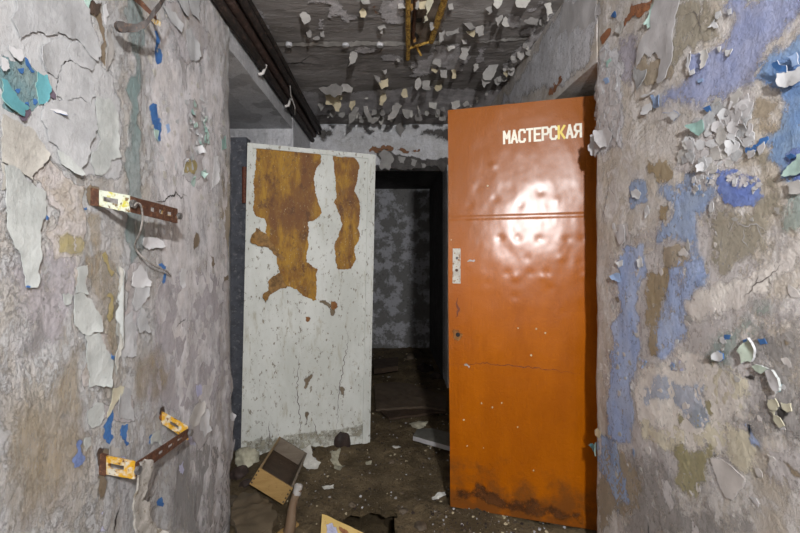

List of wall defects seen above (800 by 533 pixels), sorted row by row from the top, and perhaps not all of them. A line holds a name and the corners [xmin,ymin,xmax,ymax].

peeling [0,0,236,533]
rust [458,483,580,519]
peeling [300,0,800,533]